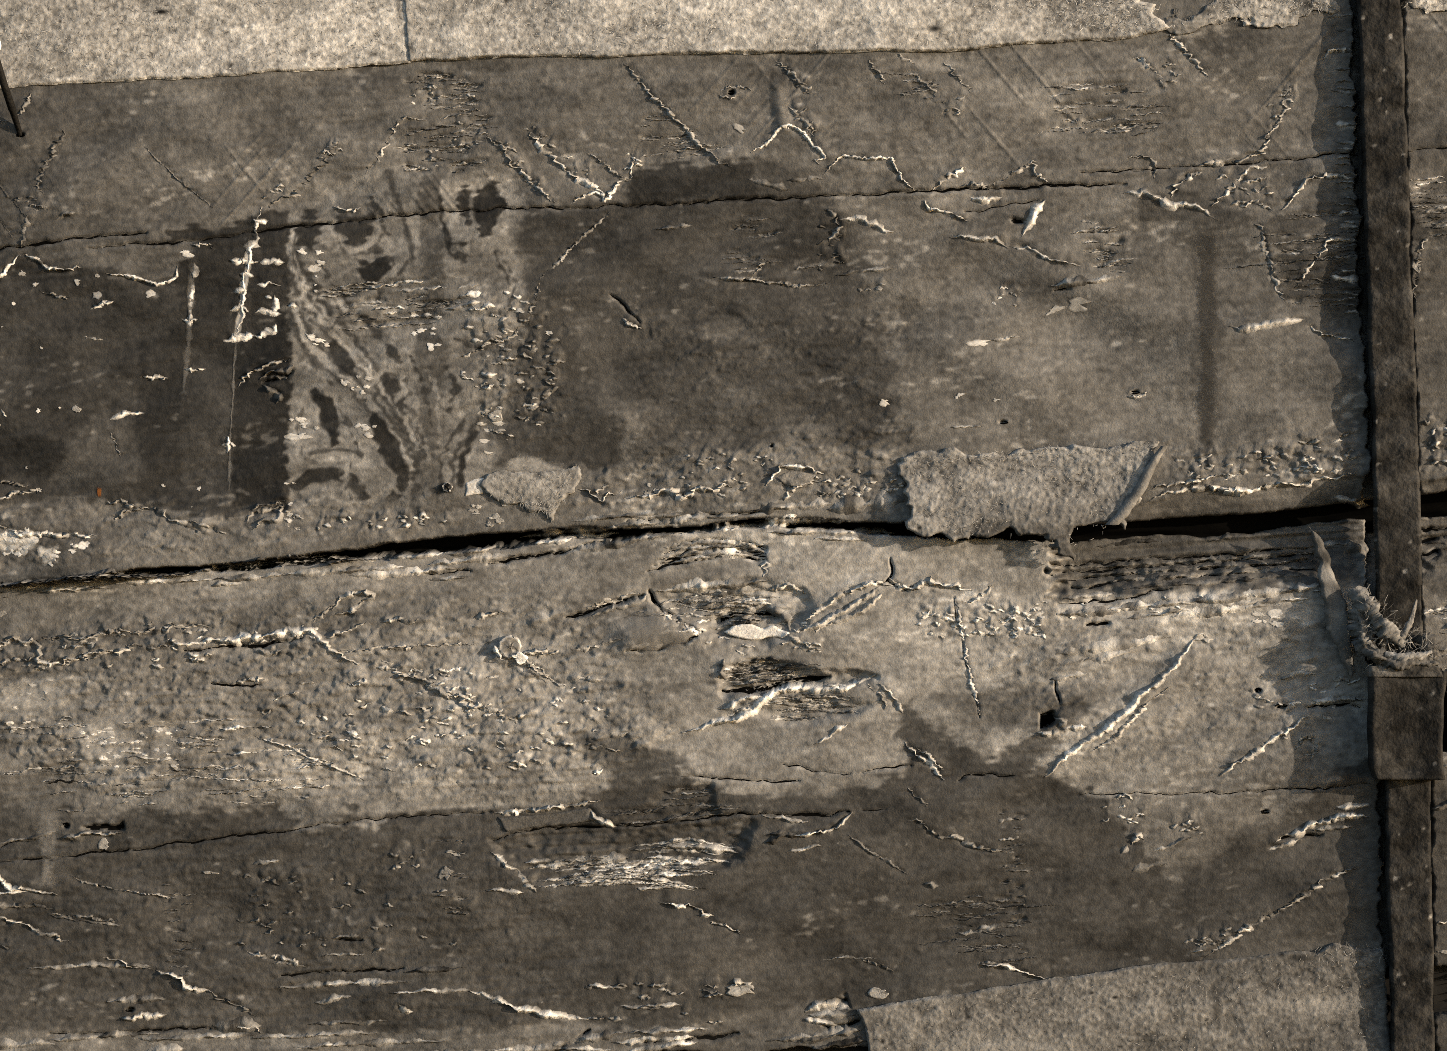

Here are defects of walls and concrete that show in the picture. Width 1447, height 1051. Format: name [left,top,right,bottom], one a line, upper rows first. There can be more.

crack [0,153,1358,251]
leakage [461,212,610,357]
peeling [465,478,504,527]
spalling [721,611,776,622]
peeling [767,560,1321,780]
leakage [1202,868,1360,957]